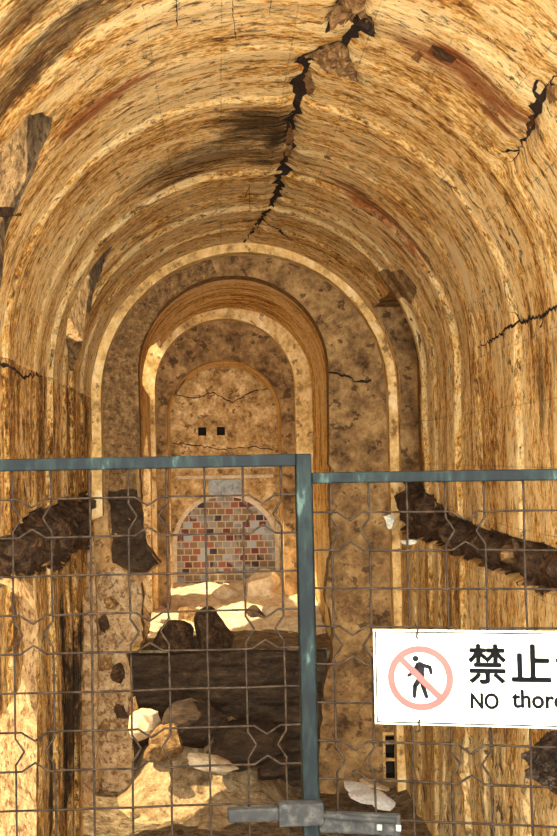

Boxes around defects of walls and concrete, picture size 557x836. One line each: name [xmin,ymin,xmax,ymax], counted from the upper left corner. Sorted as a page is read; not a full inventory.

spalling [297,40,359,82]
spalling [325,0,375,37]
crack [243,0,376,243]
crack [503,75,557,166]
crack [0,362,42,380]
spalling [102,260,216,457]
spalling [378,269,417,304]
crack [477,305,557,348]
spalling [394,482,557,596]
peeling [0,469,159,792]
peeling [435,730,557,836]